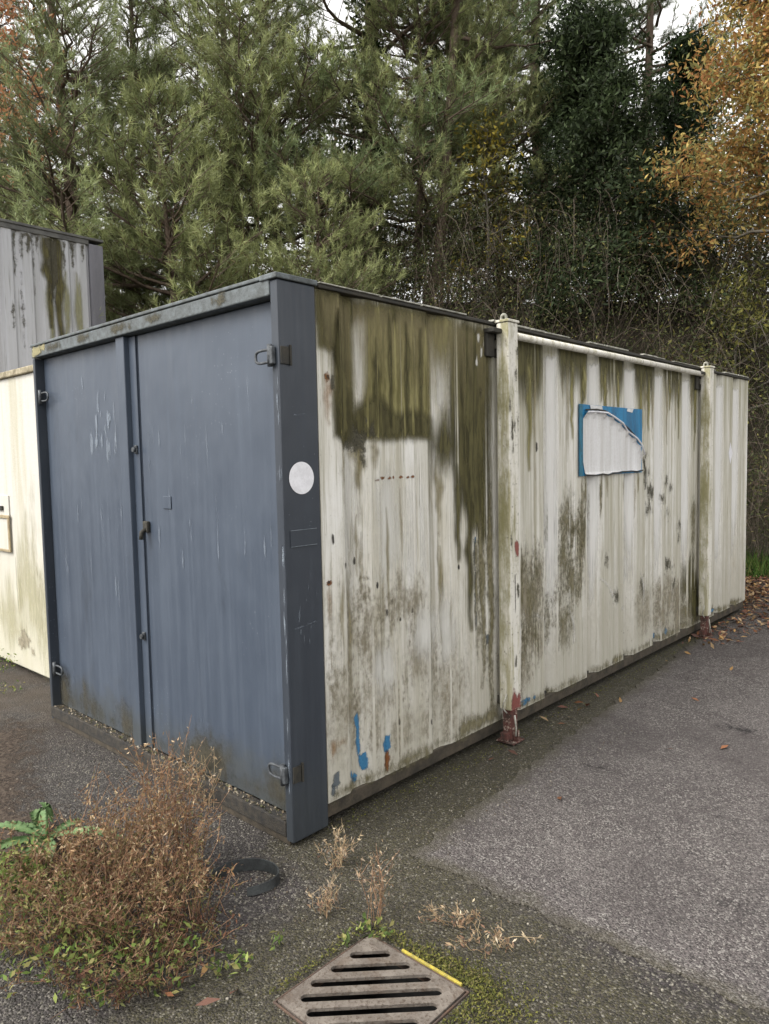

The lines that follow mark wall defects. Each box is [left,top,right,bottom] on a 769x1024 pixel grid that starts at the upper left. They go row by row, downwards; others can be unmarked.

damp [11,232,88,349]
damp [333,310,423,483]
damp [559,341,697,446]
damp [341,528,422,668]
damp [454,470,494,706]
damp [515,480,608,680]
peeling [331,713,369,797]
peeling [383,735,391,771]
rust [512,692,521,711]